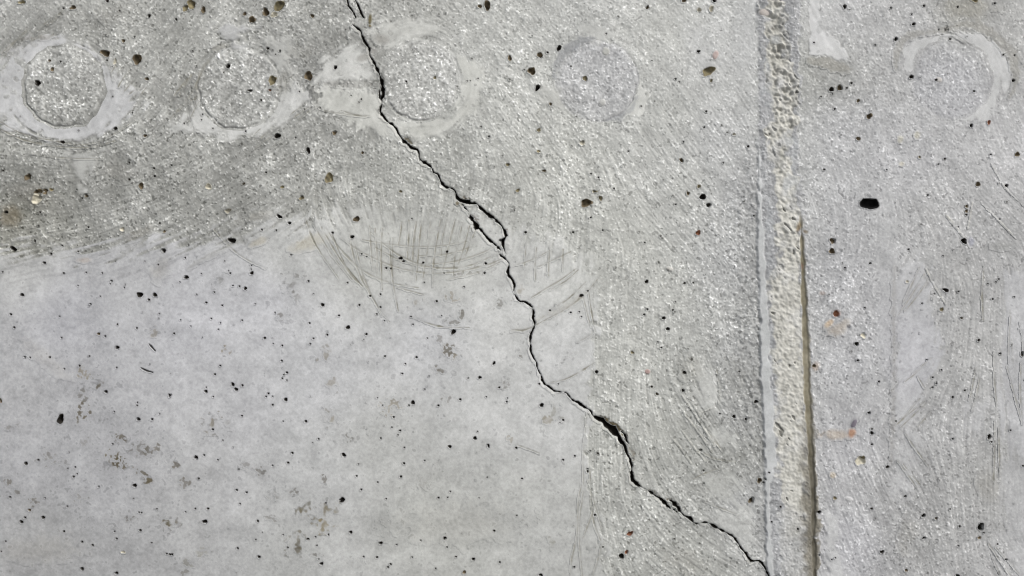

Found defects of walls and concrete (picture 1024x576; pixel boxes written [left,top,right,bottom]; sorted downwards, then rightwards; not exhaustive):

crack [346,0,770,576]